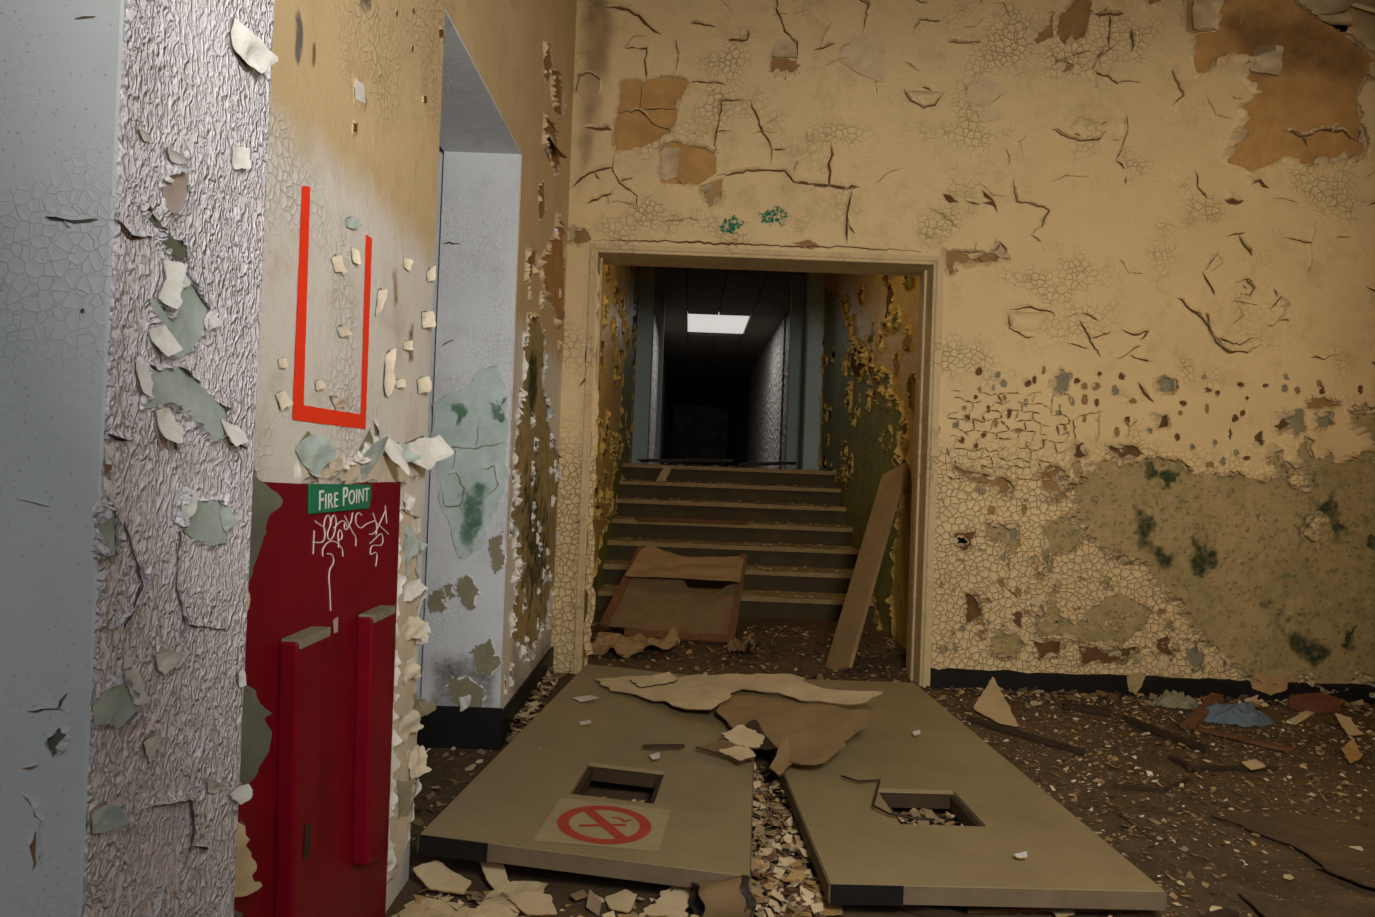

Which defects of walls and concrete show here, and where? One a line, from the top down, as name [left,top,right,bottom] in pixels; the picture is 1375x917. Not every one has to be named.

peeling [134,126,251,451]
peeling [294,40,594,916]
crack [570,0,922,656]
peeling [819,275,919,640]
crack [945,310,1179,481]
crack [929,4,1243,262]
leakage [1137,511,1172,567]
peeling [935,365,1375,727]
leakage [1145,462,1179,486]
leakage [1192,537,1217,577]
crack [1177,171,1351,335]
leakage [1289,630,1356,665]